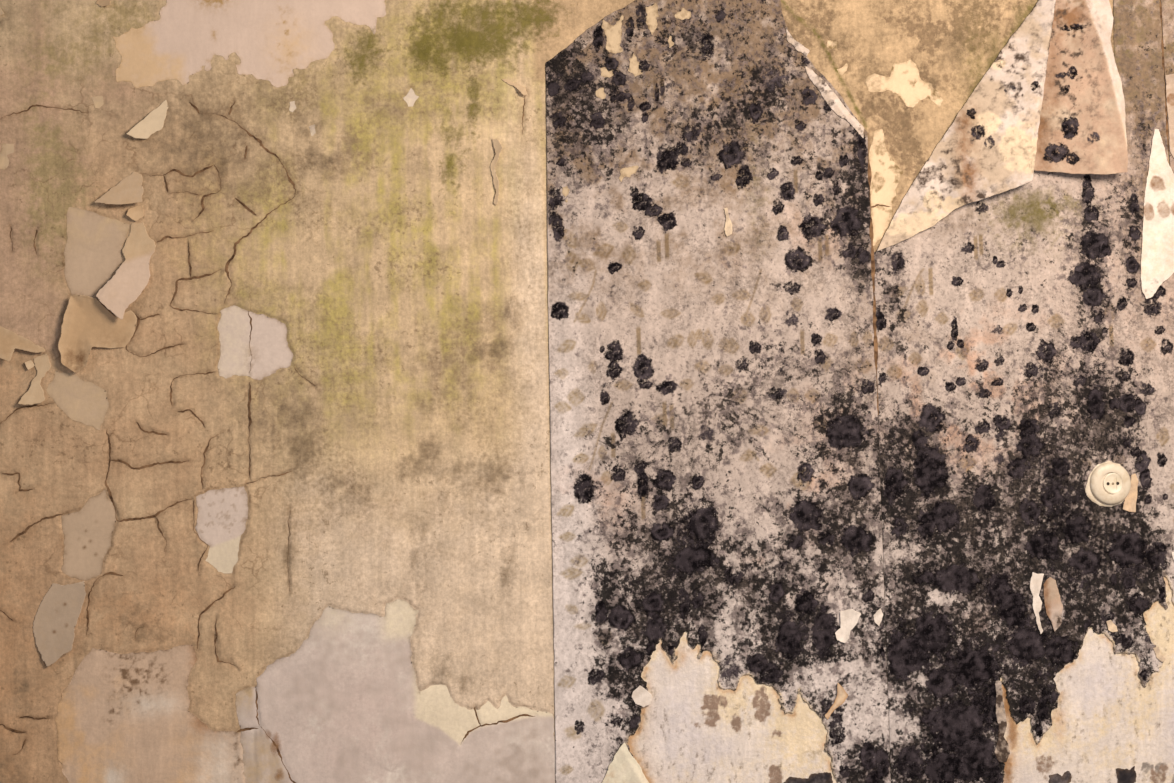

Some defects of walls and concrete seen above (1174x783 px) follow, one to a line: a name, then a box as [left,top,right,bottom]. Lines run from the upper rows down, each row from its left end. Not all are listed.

peeling [0,172,156,430]
crack [105,372,291,573]
crack [126,102,296,357]
damp [600,340,678,409]
damp [767,135,869,295]
damp [1006,286,1168,504]
crack [197,587,235,665]
peeling [55,599,556,783]
crack [461,707,534,743]
peeling [628,631,838,783]
damp [839,562,1152,783]
peeling [1000,576,1174,783]